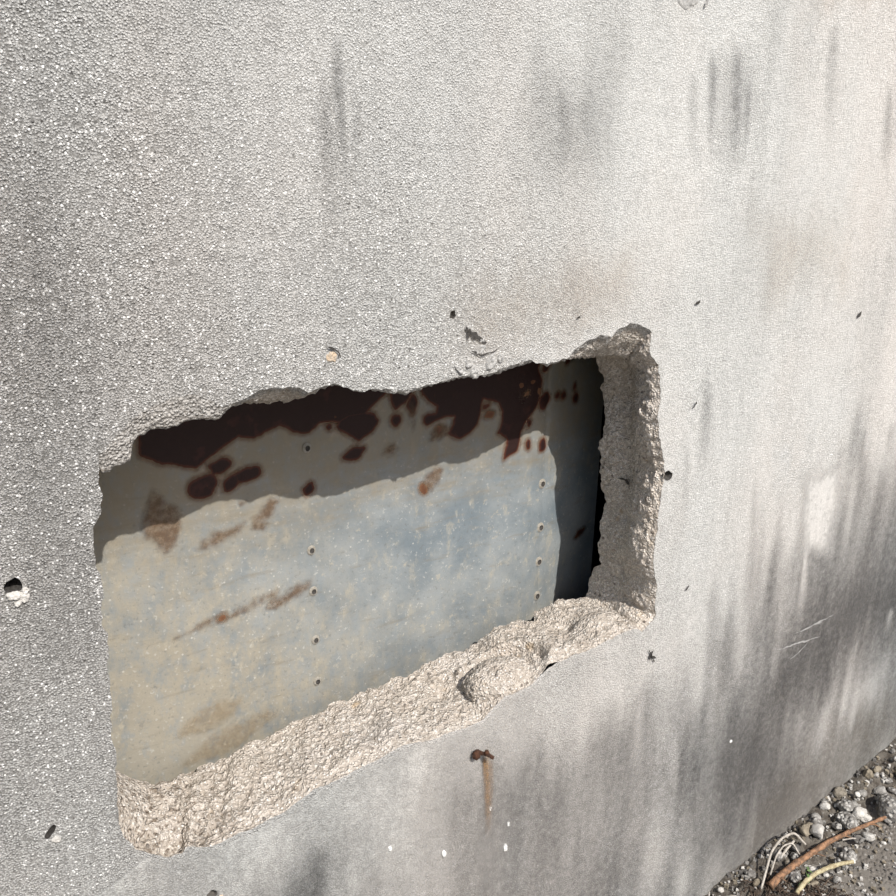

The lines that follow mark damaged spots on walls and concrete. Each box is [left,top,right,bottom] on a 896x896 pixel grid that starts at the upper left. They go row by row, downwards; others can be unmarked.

spalling [326,346,341,362]
spalling [454,325,504,379]
rust [138,361,578,499]
rust [146,498,179,550]
rust [255,501,276,528]
leakage [689,470,896,873]